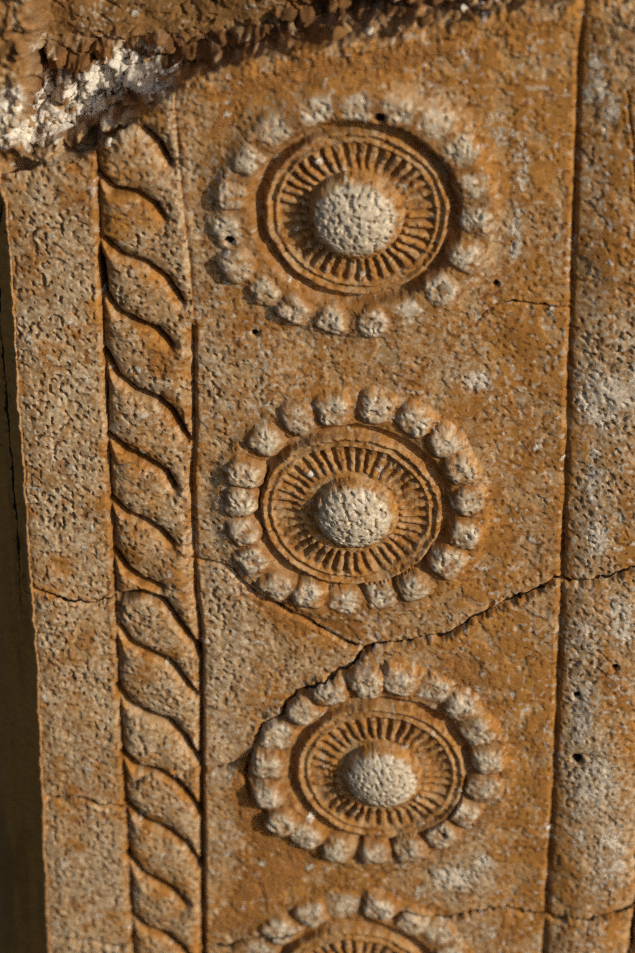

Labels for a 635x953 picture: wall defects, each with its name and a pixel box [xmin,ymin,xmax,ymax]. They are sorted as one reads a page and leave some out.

spalling [0,44,182,152]
crack [0,289,21,611]
crack [43,589,115,603]
crack [190,561,635,786]
crack [49,795,123,807]
crack [192,927,303,948]
crack [401,898,635,953]